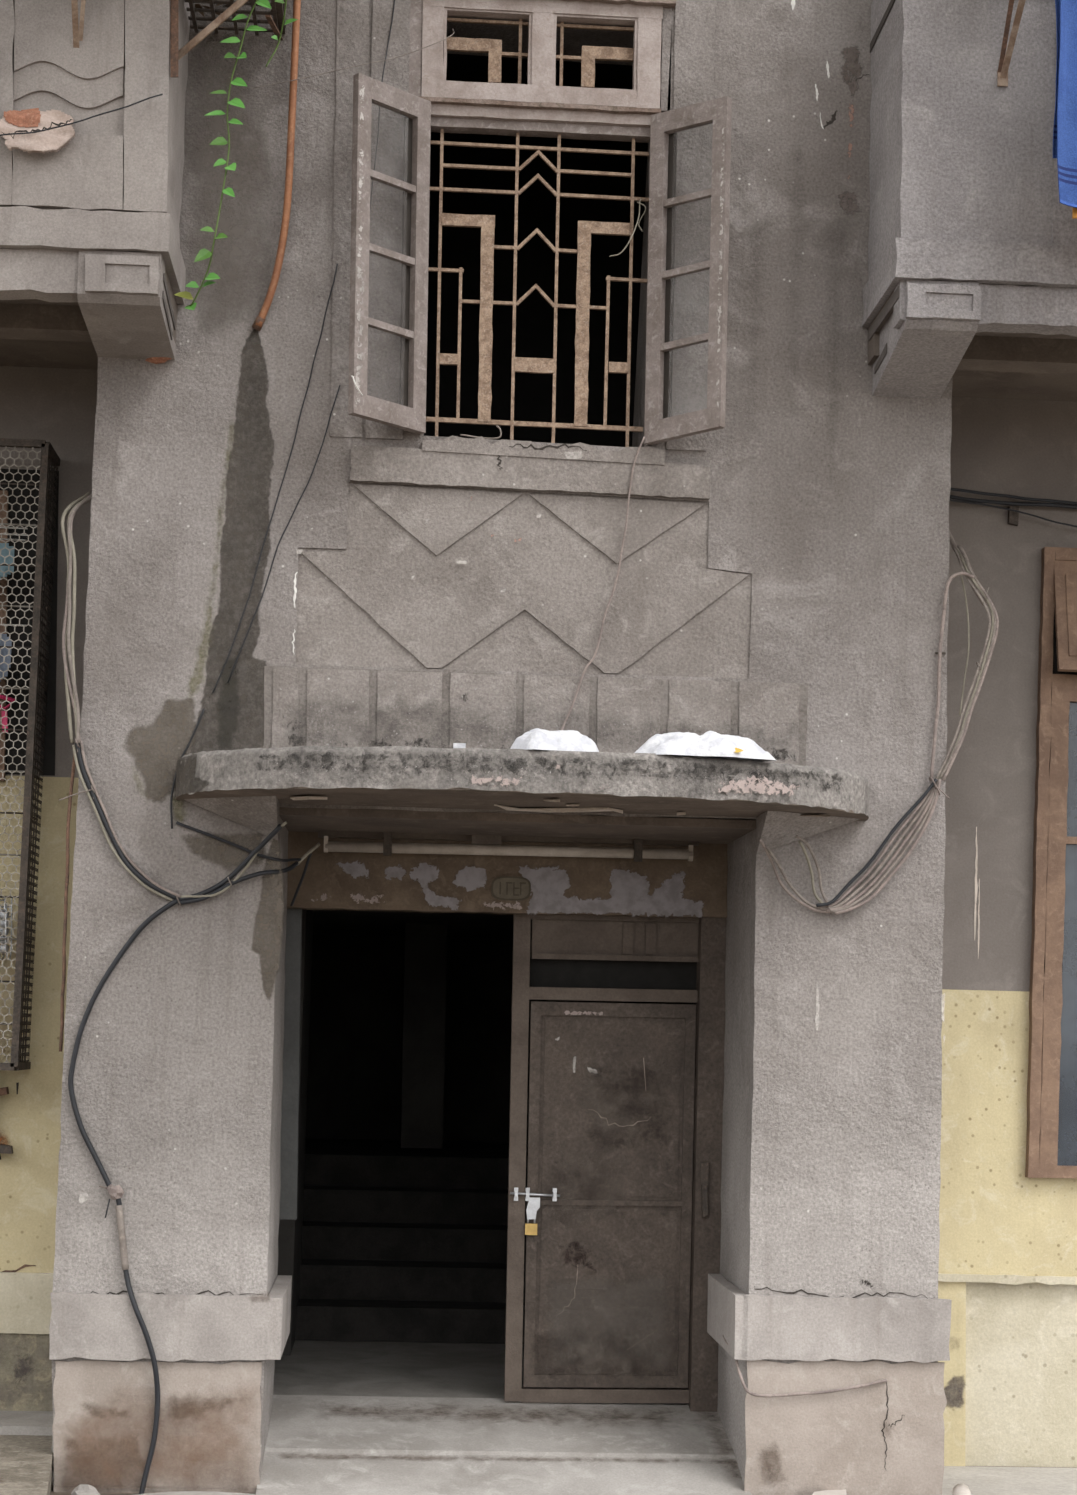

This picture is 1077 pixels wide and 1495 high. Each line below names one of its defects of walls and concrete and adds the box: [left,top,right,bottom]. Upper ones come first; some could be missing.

spalling [0,108,75,153]
leakage [126,329,841,820]
leakage [186,834,284,998]
peeling [336,860,704,918]
crack [764,1451,777,1478]
crack [881,1382,905,1471]